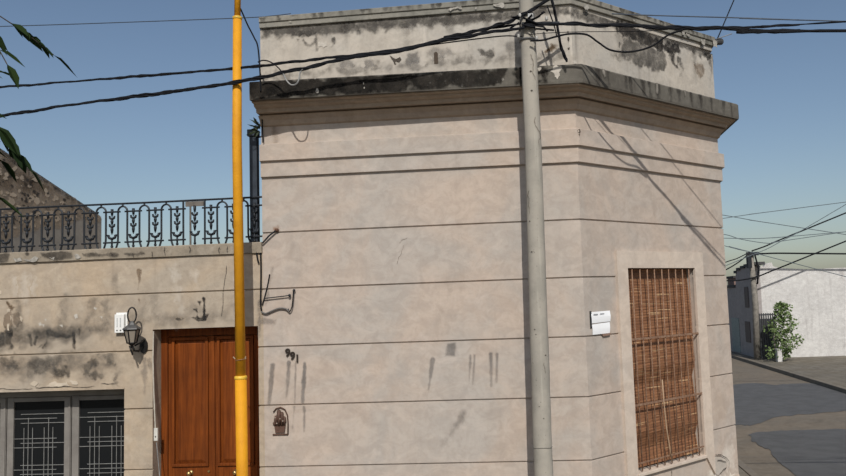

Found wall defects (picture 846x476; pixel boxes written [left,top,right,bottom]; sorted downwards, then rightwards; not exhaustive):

damp [249,27,522,99]
damp [616,20,680,71]
flaking render [0,151,101,240]
damp [8,269,39,321]
damp [166,262,208,321]
damp [0,332,13,348]
damp [28,329,79,348]